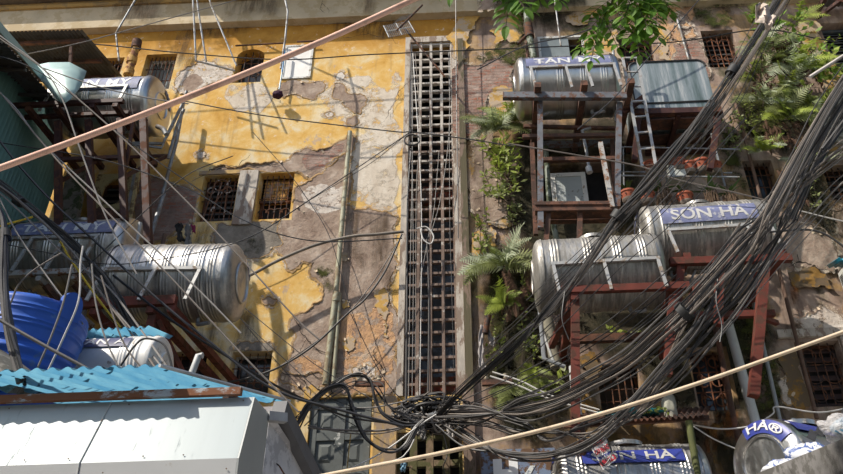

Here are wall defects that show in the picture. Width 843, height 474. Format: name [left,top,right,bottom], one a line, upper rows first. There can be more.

flaking render [172,57,234,95]
flaking render [193,149,210,160]
flaking render [210,70,405,401]